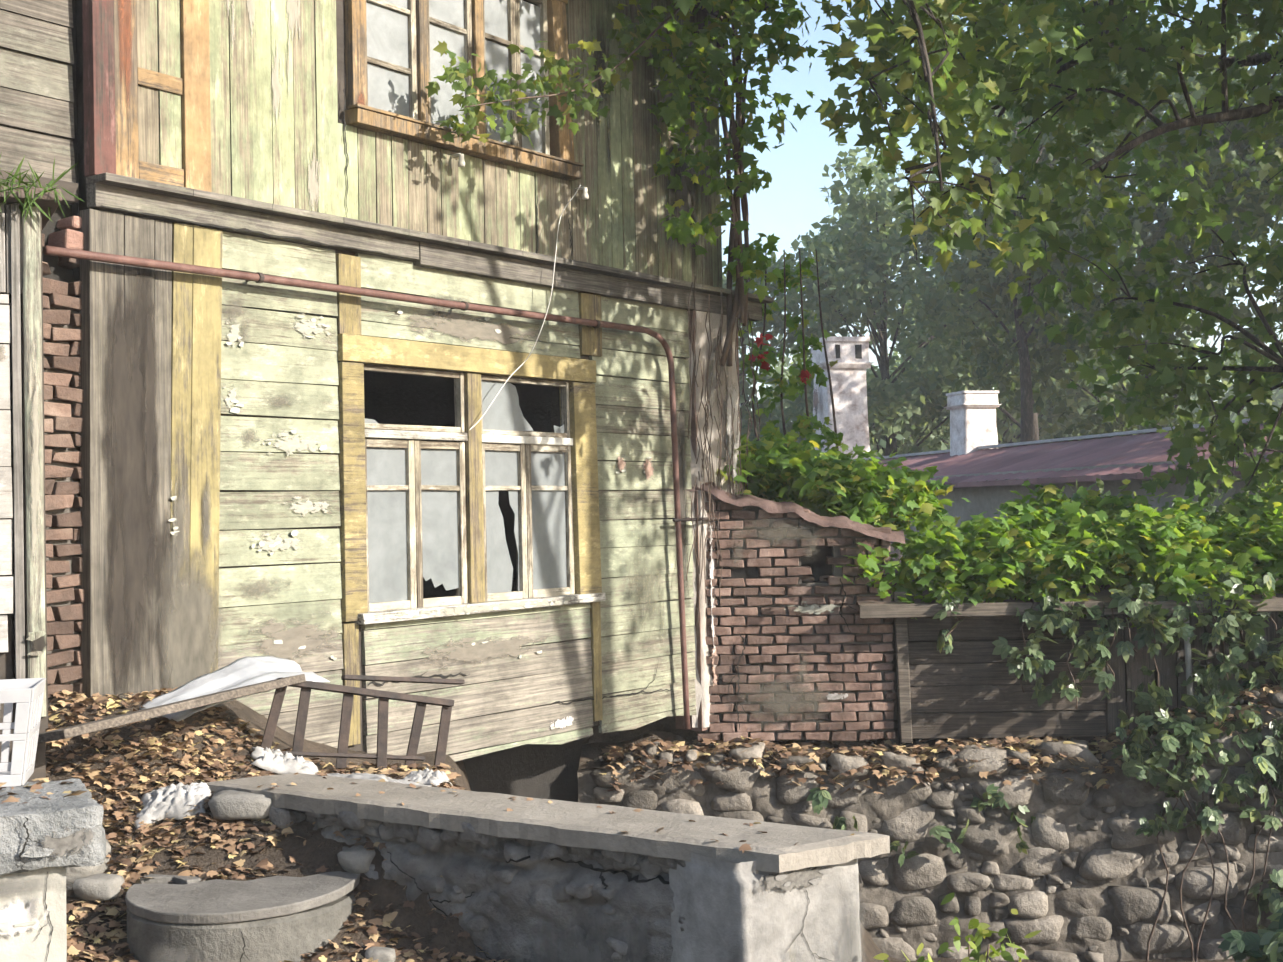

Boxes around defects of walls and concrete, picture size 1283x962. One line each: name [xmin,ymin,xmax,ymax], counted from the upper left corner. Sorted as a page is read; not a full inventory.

leakage [103,269,221,695]
crack [19,817,53,961]
crack [786,891,831,961]